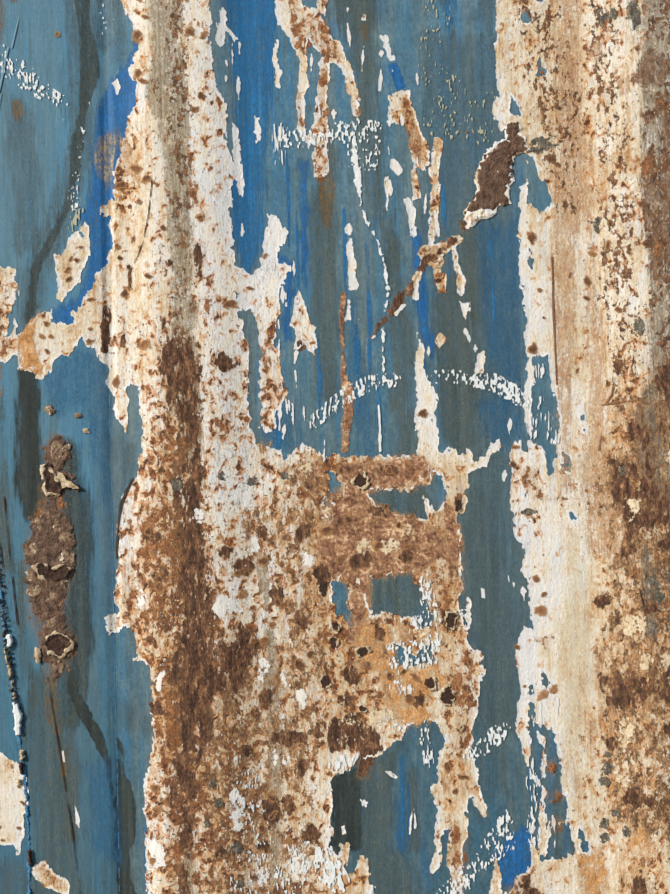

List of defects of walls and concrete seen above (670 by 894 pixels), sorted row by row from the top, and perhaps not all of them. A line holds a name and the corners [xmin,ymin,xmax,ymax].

peeling [215,7,241,55]
corrosion [114,138,151,190]
peeling [272,0,485,321]
corrosion [115,243,133,298]
corrosion [86,305,126,353]
peeling [290,291,318,388]
corrosion [120,0,477,894]
peeling [350,339,501,543]
peeling [639,523,669,546]
peeling [536,731,547,778]
peeling [0,749,29,855]
peeling [496,809,514,841]